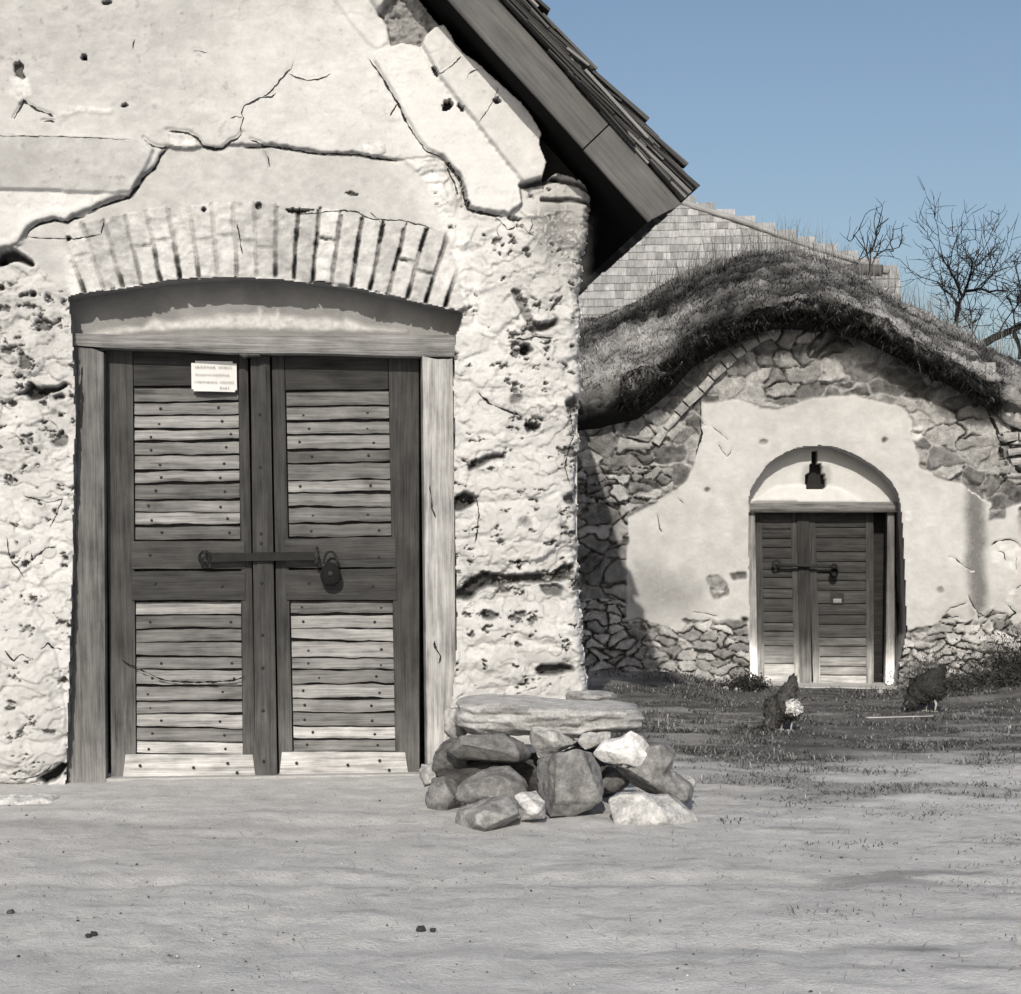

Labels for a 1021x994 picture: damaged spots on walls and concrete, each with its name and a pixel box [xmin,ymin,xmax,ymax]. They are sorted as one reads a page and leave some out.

spalling [379,0,440,47]
crack [0,64,394,240]
crack [369,59,534,236]
crack [291,209,430,228]
spalling [0,132,1021,712]
spalling [0,725,68,785]
spalling [510,735,535,753]